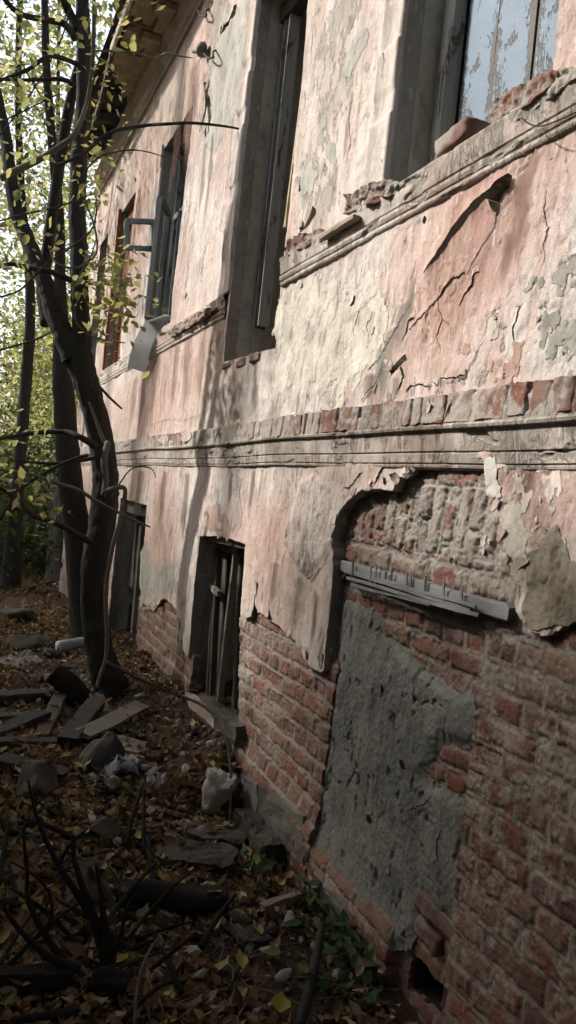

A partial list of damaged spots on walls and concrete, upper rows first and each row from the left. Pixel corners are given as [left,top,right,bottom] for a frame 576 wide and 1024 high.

spalling [489,67,576,122]
spalling [283,219,325,256]
spalling [343,179,400,215]
peeling [231,254,576,439]
crack [350,148,539,425]
flaking render [136,544,202,693]
flaking render [233,579,341,888]
flaking render [333,456,576,1024]